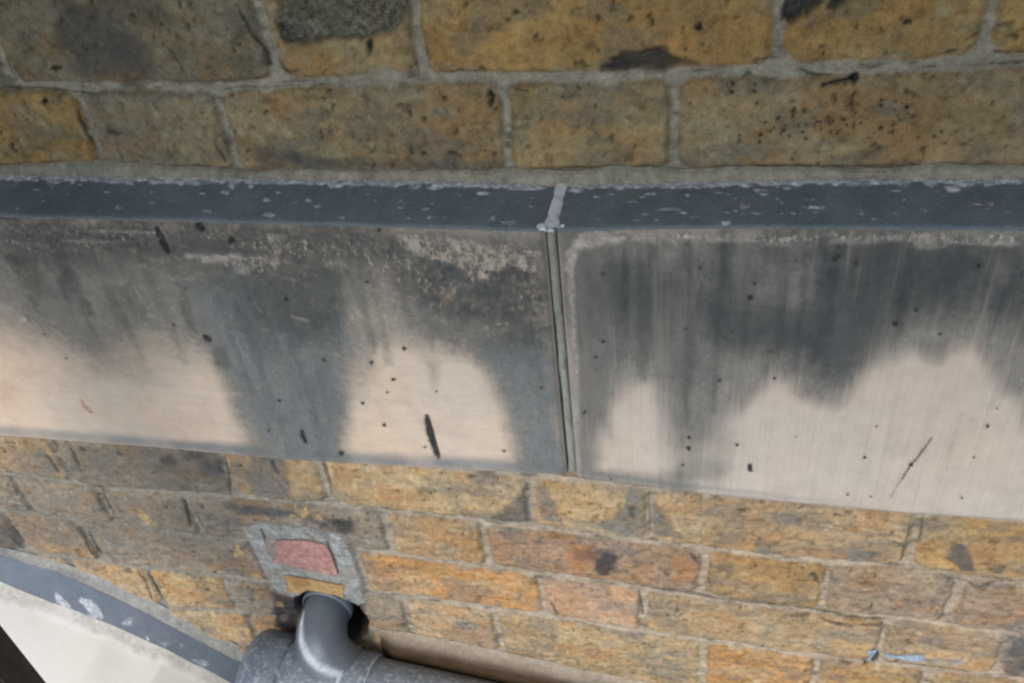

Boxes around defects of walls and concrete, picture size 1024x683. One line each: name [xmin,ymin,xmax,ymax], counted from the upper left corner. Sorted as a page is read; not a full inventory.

water stain [0,174,545,195]
water stain [0,213,562,470]
water stain [562,230,1024,472]